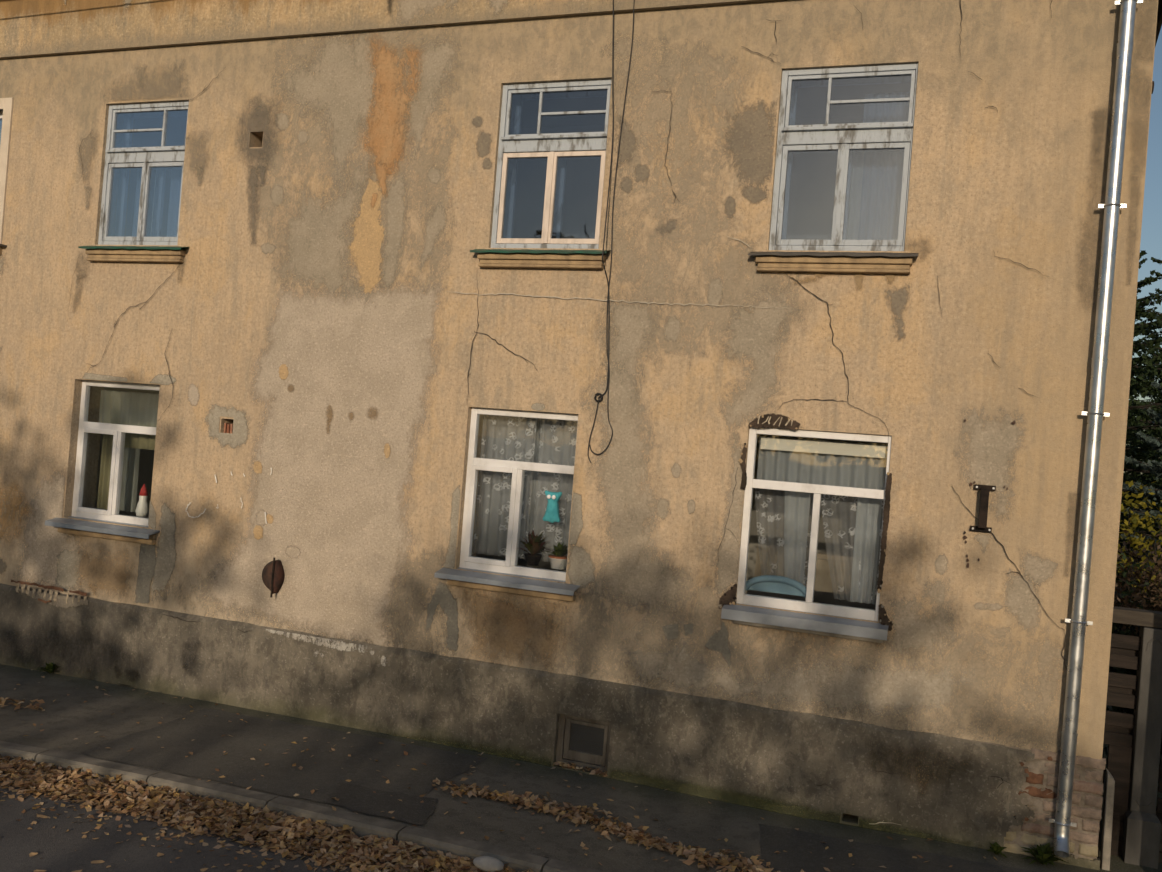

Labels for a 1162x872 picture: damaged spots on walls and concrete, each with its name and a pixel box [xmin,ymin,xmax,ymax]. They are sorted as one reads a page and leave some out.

leakage [240,104,275,241]
peeling [274,33,380,189]
peeling [472,116,492,169]
crack [83,263,181,377]
crack [447,273,889,434]
peeling [188,178,442,667]
peeling [135,501,176,604]
peeling [426,582,459,651]
peeling [568,301,964,714]
crack [952,486,1067,669]
flaking render [970,740,1061,857]
flaking render [1069,756,1106,861]